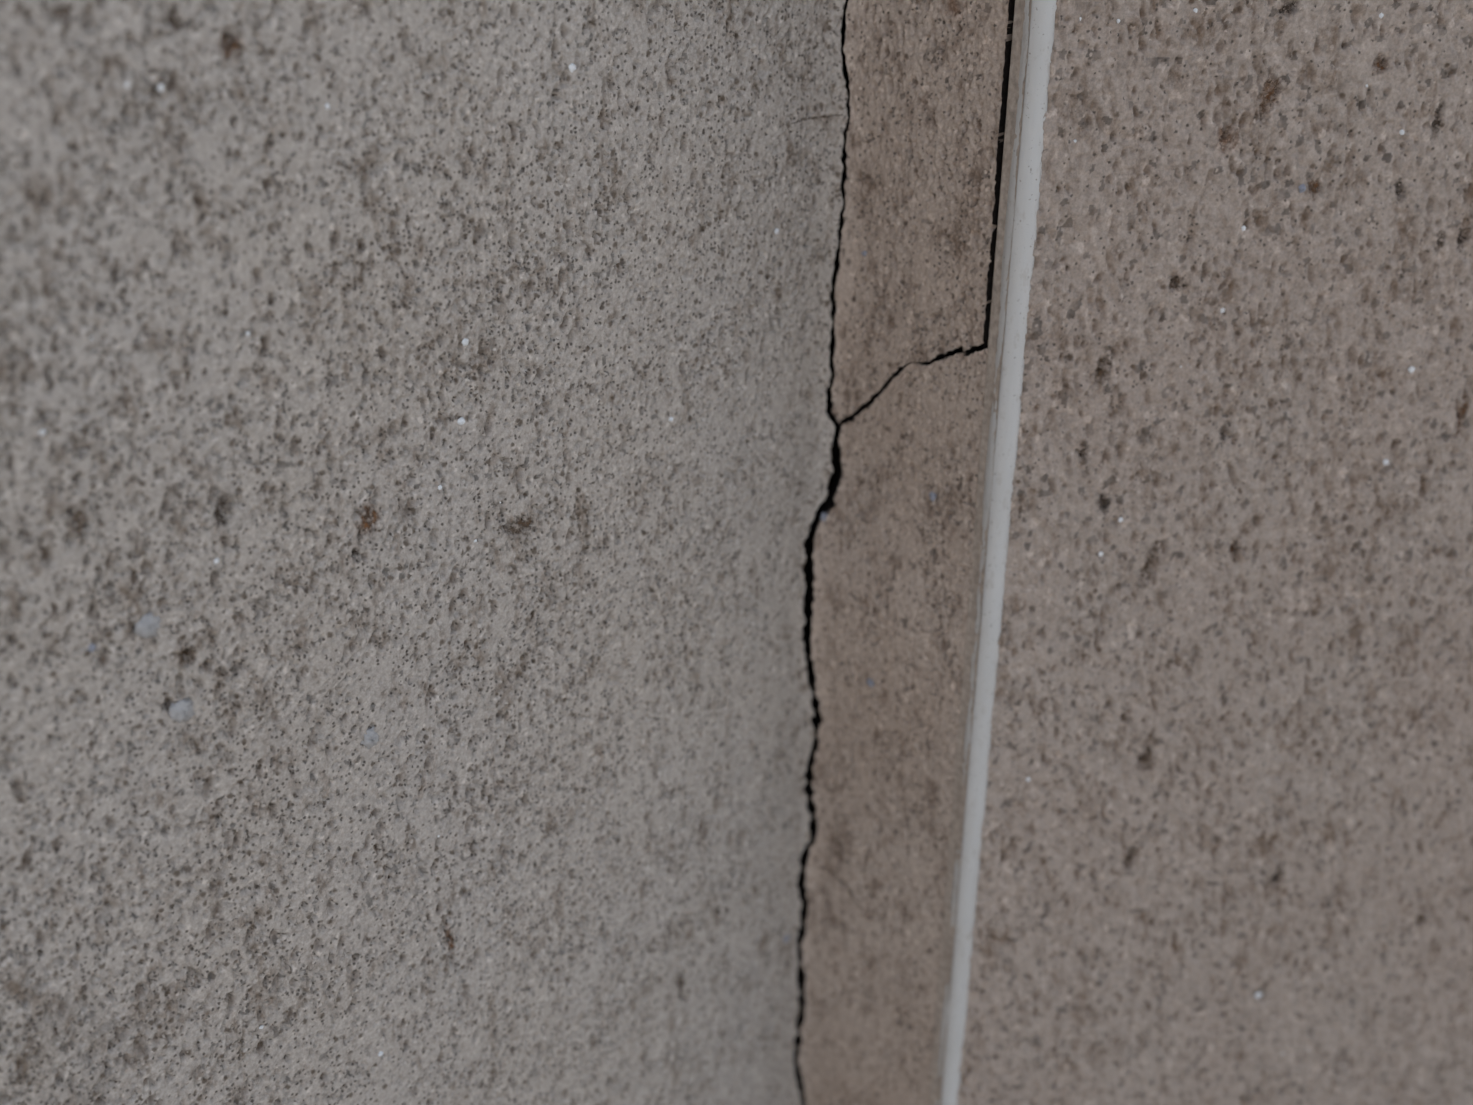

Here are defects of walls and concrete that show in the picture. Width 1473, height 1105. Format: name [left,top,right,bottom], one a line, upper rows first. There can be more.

crack [792,0,988,1105]